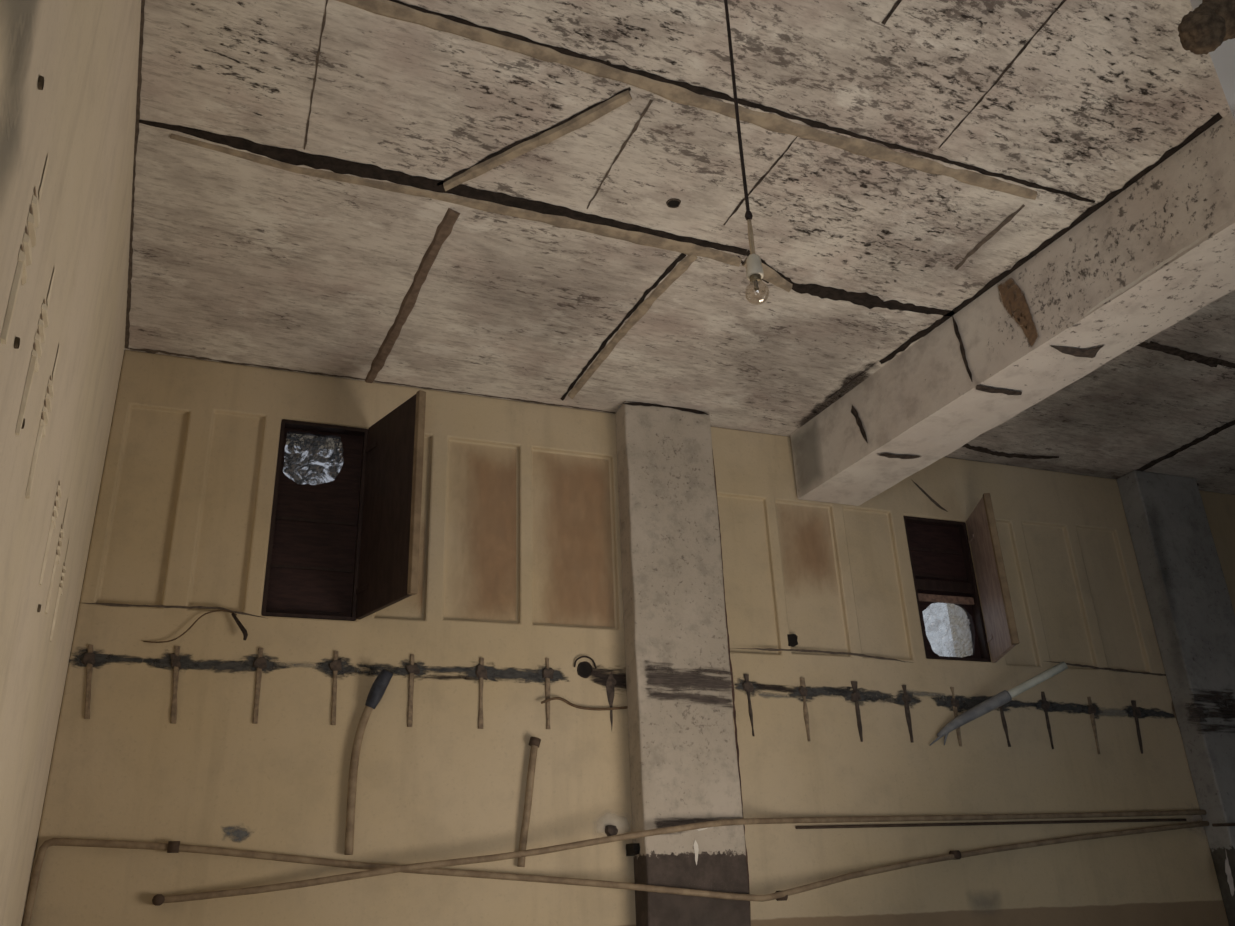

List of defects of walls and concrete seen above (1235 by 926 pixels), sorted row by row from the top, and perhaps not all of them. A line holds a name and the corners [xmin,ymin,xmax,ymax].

crack [881,0,902,25]
crack [125,0,709,415]
crack [952,315,1022,395]
crack [851,405,948,512]
crack [712,449,913,916]